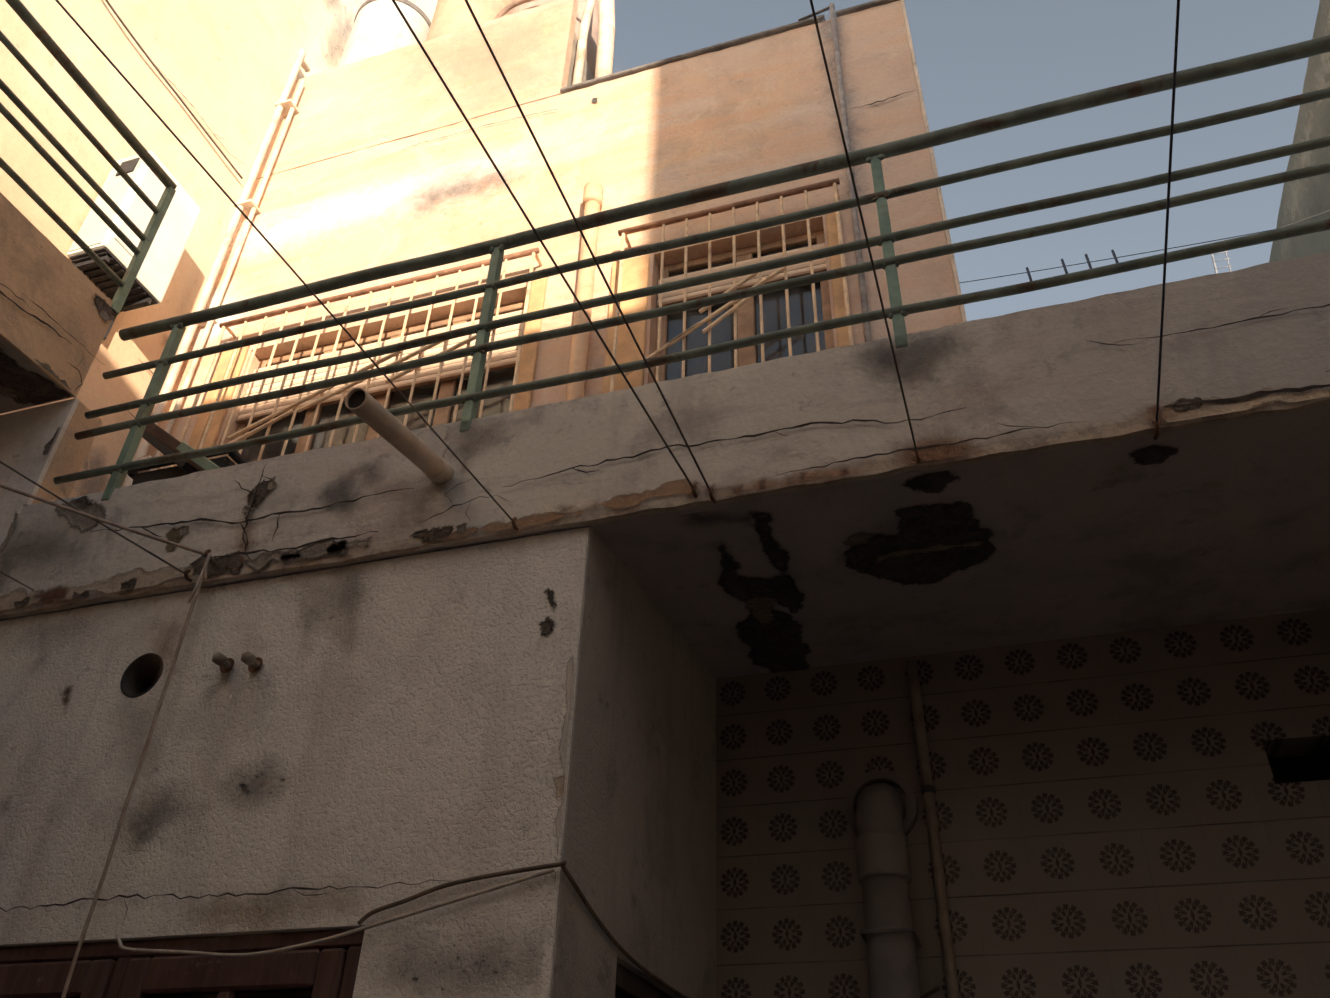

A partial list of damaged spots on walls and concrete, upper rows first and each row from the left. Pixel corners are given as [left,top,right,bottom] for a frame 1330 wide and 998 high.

crack [0,283,103,391]
crack [1087,304,1330,346]
spalling [0,349,71,405]
crack [1163,370,1330,407]
crack [418,407,1071,523]
crack [90,462,414,562]
spalling [190,537,372,578]
flaking render [411,479,692,543]
spalling [843,470,996,585]
spalling [539,588,557,636]
spalling [691,512,811,673]
crack [0,880,440,925]